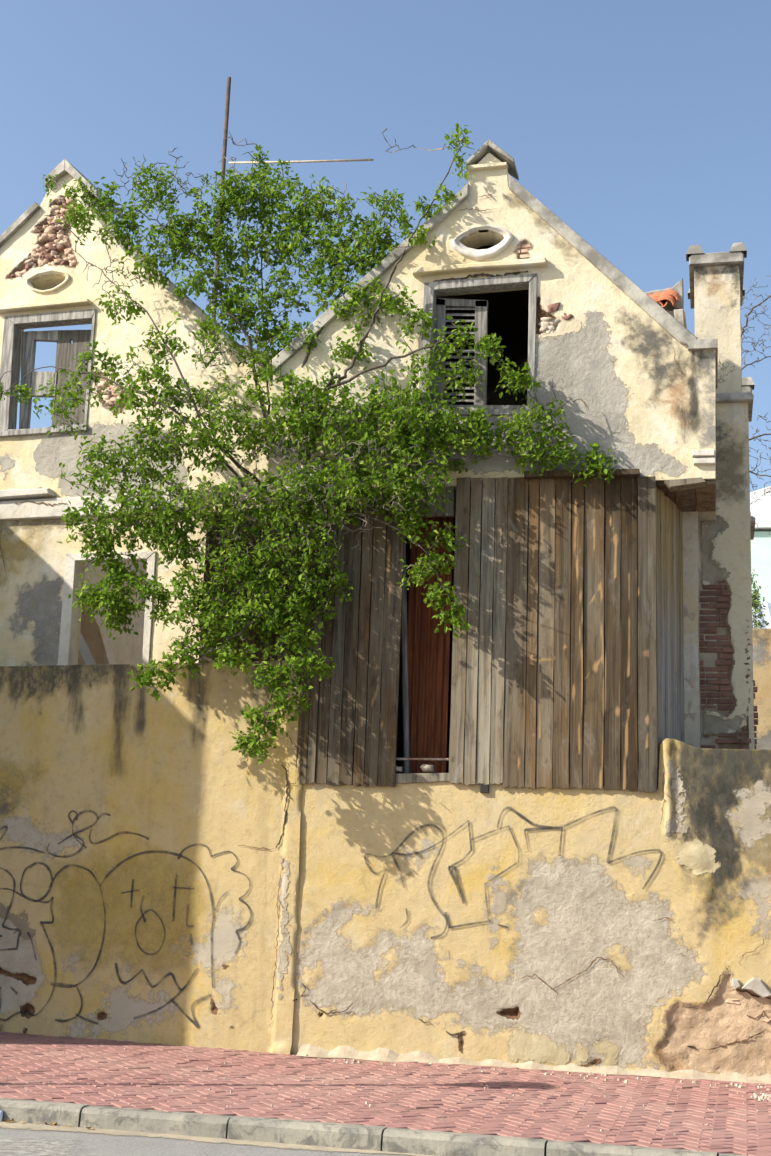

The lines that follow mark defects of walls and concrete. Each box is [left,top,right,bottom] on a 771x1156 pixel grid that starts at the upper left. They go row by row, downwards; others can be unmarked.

flaking render [6,195,79,280]
leakage [722,265,741,330]
peeling [386,295,687,477]
leakage [621,315,744,497]
flaking render [699,506,771,750]
leakage [0,664,155,752]
leakage [188,663,206,735]
leakage [668,696,771,935]
peeling [0,904,46,1033]
peeling [170,905,248,1014]
peeling [275,853,771,1077]
crack [517,955,624,999]